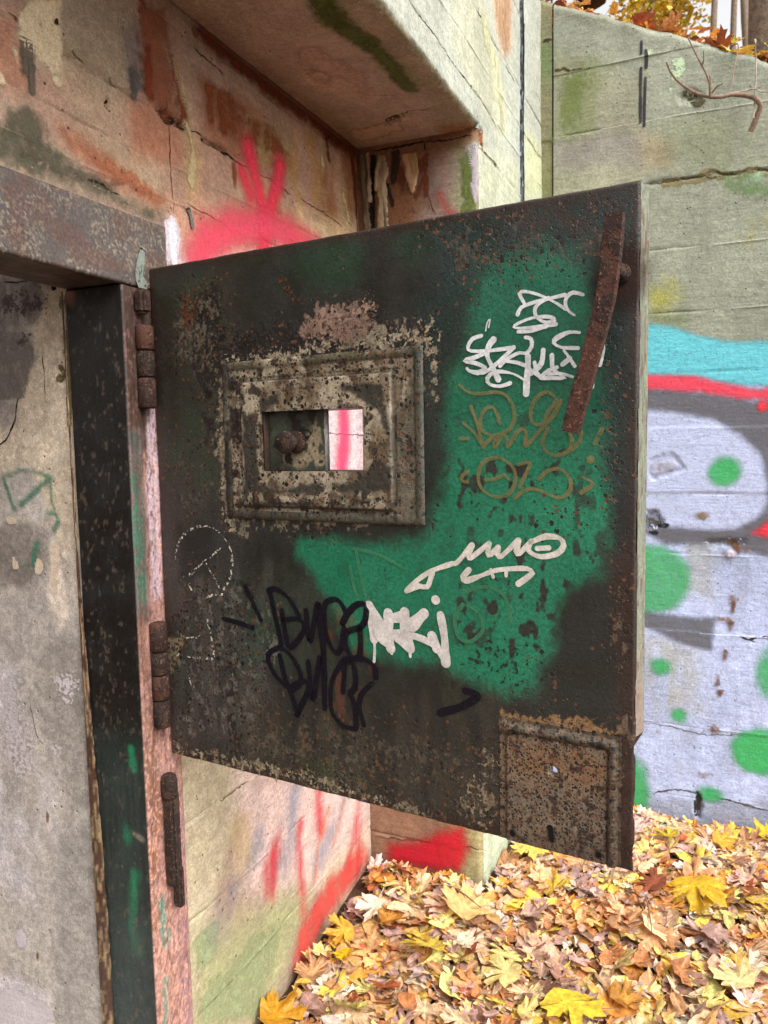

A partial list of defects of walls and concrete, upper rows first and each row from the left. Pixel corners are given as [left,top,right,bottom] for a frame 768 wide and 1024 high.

crack [163,106,340,224]
crack [649,167,768,184]
rust [616,248,648,305]
peeling [220,297,441,401]
peeling [215,379,236,532]
crack [654,789,767,811]